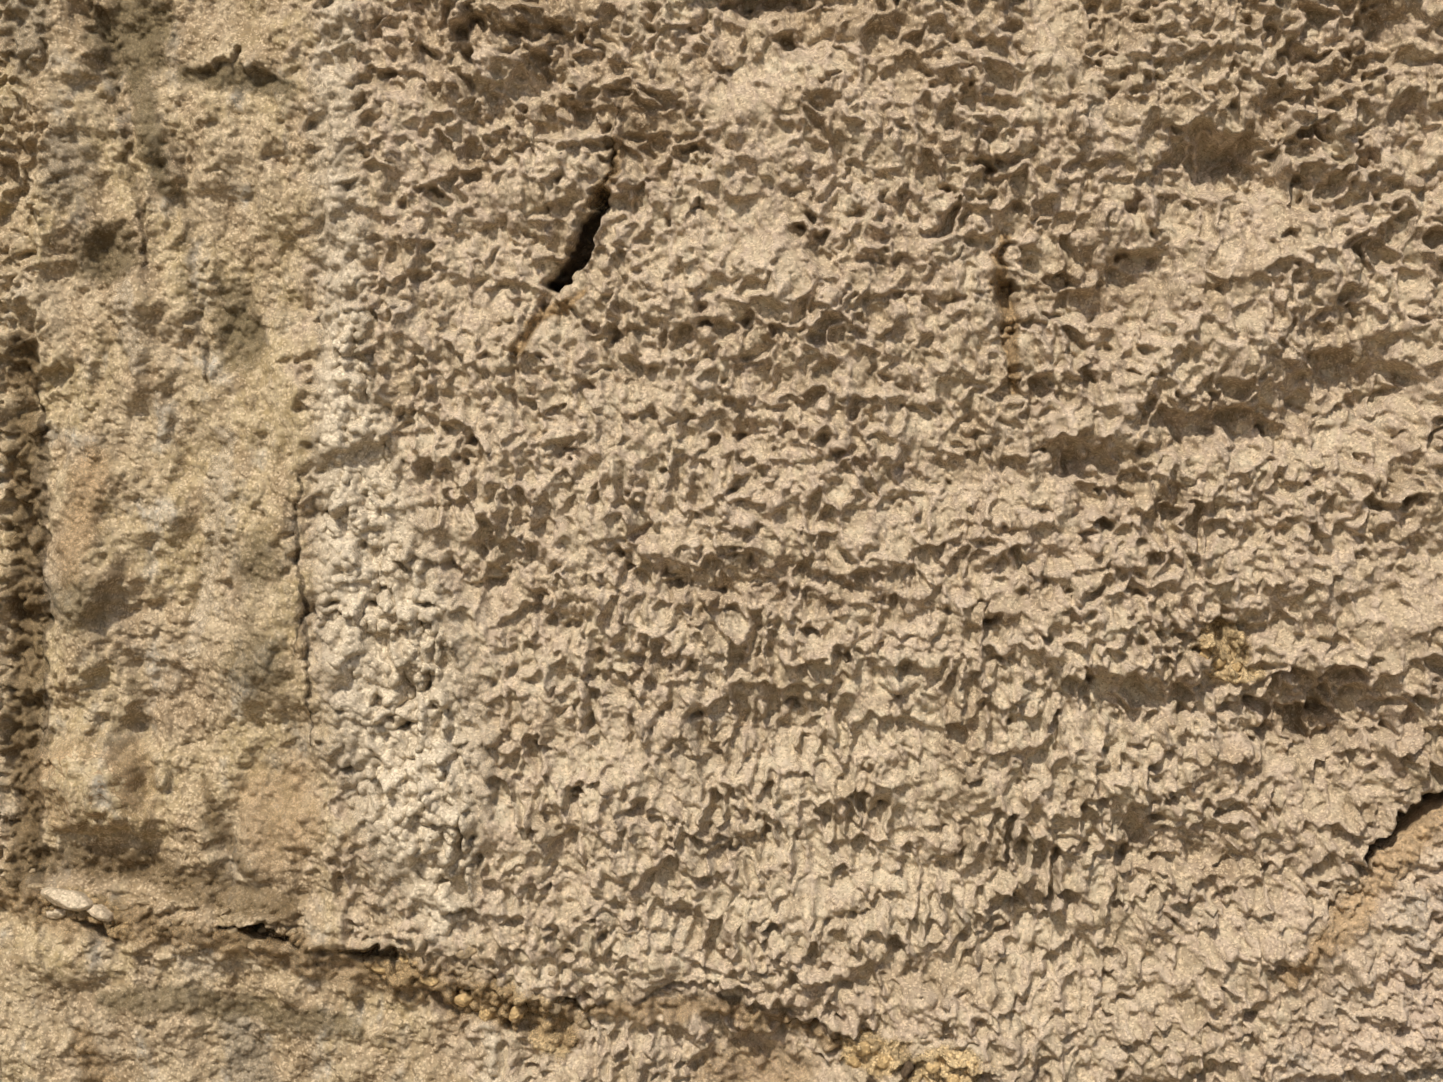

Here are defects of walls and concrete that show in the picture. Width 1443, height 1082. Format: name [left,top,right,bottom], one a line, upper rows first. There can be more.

crack [549,148,617,292]
crack [1362,832,1393,868]
crack [216,923,299,950]
crack [337,943,418,967]